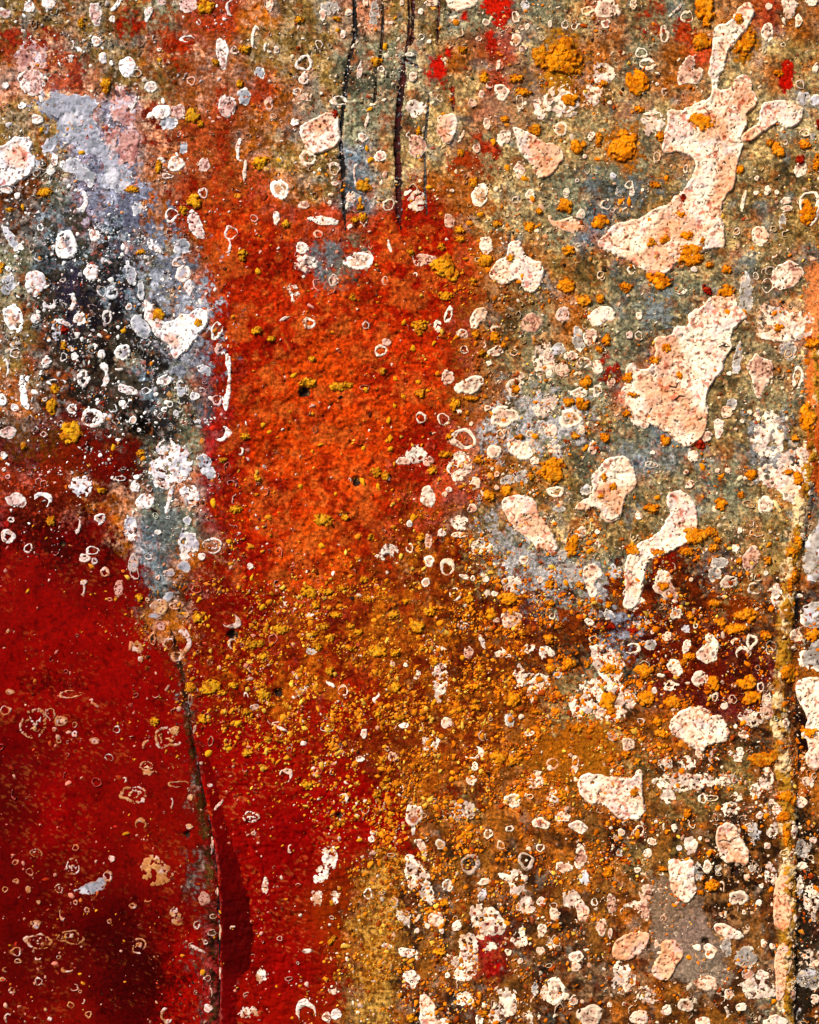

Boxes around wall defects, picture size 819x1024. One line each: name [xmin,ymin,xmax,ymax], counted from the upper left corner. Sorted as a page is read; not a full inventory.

crack [339,0,455,231]
peeling [595,0,819,275]
peeling [456,260,814,695]
crack [170,629,221,1019]